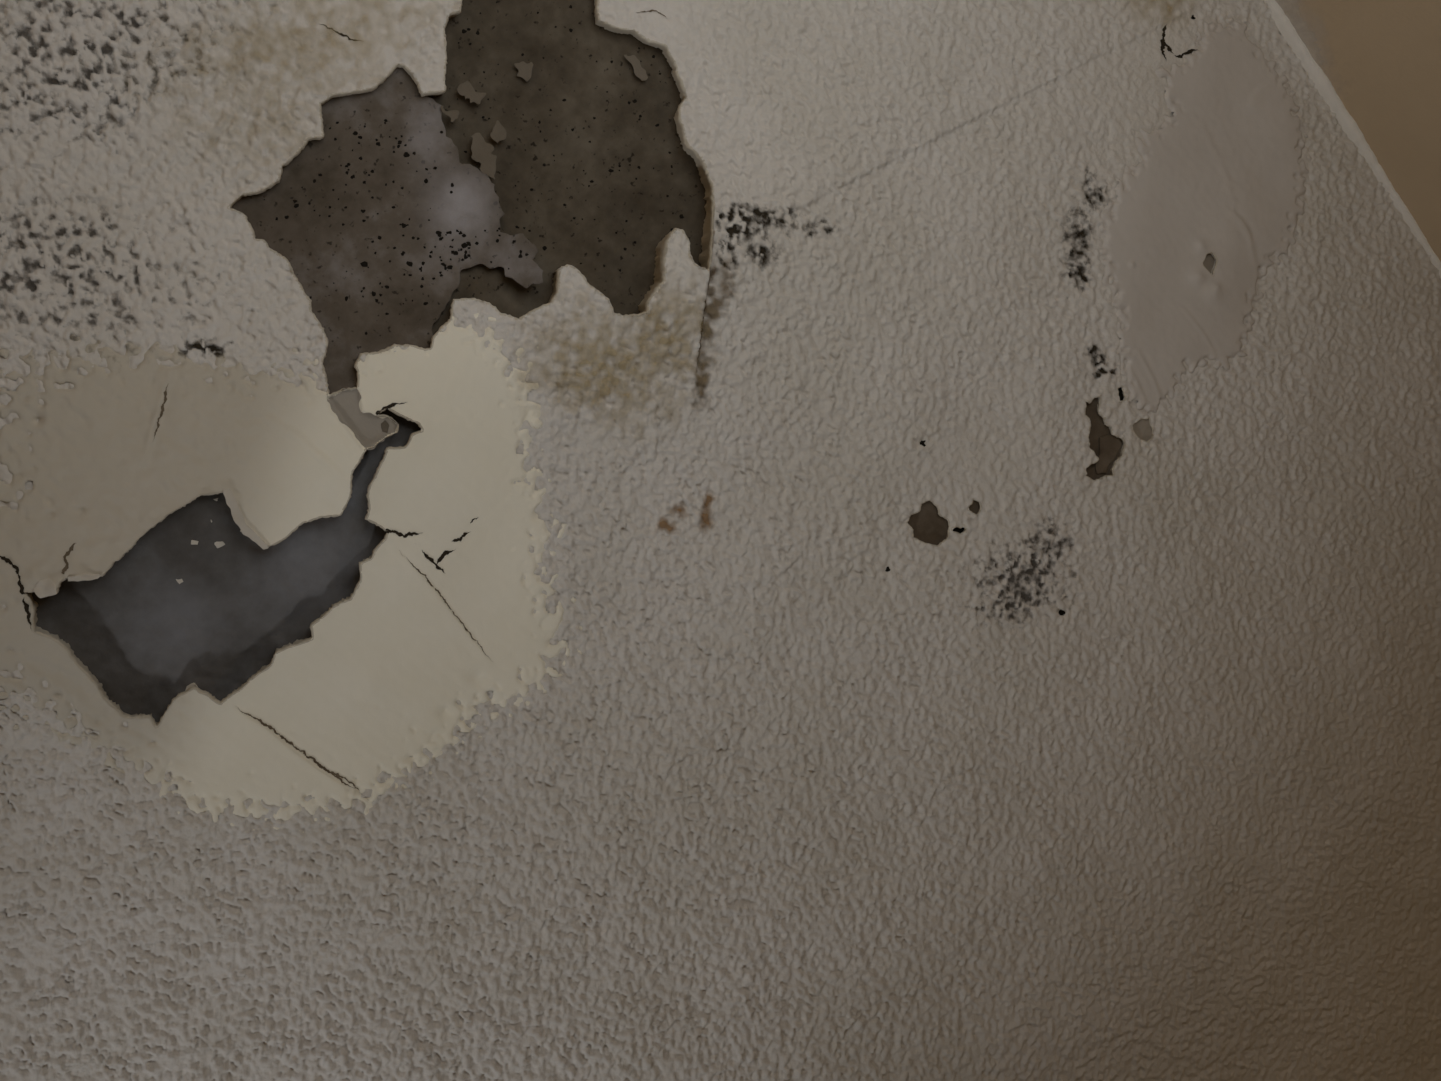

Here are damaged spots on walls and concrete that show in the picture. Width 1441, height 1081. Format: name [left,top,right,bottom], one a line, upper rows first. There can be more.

peeling [1202,252,1218,276]
peeling [23,0,716,729]
peeling [1084,386,1154,481]
peeling [906,498,981,547]
crack [385,518,493,662]
crack [241,711,359,790]